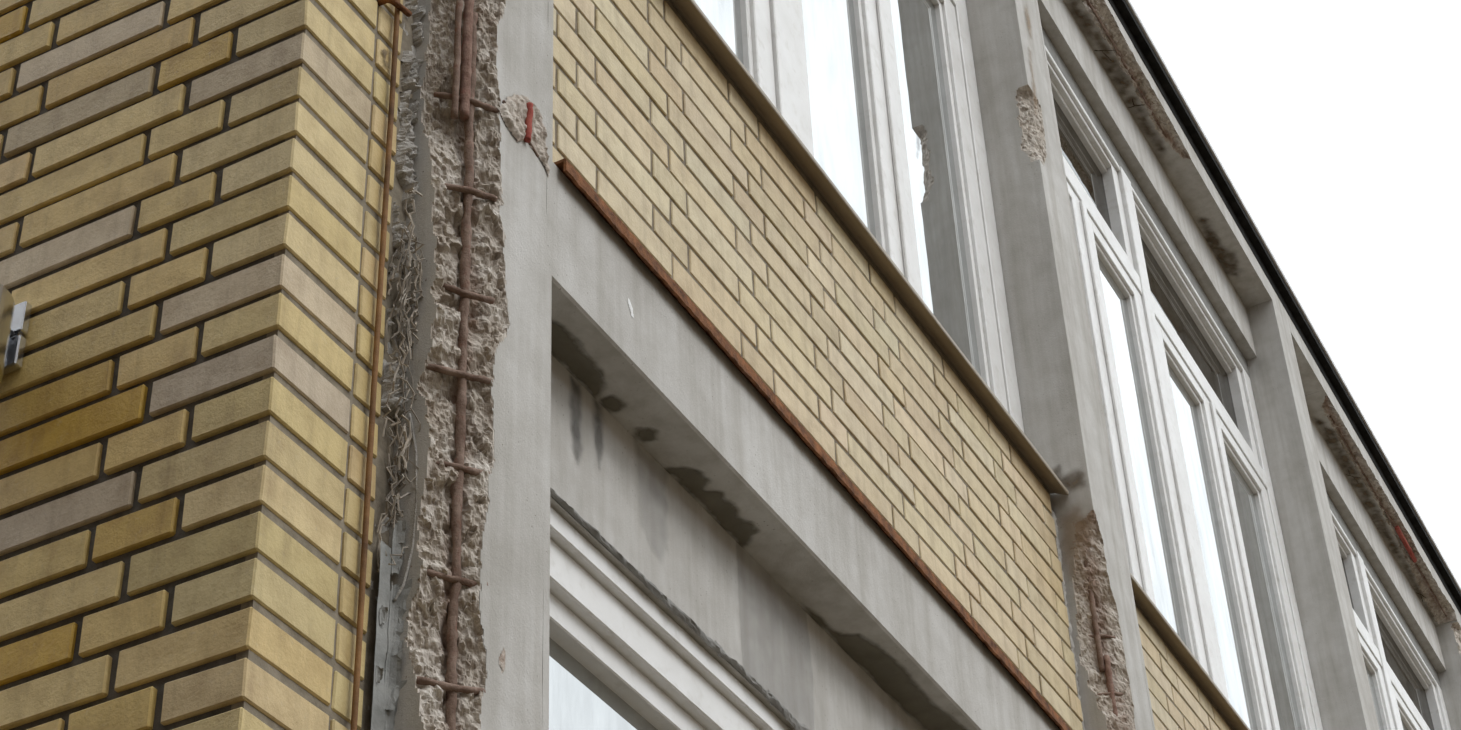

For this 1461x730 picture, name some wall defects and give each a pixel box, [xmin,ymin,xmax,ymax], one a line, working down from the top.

spalling [1015,84,1047,165]
spalling [371,0,550,730]
water stain [551,322,624,457]
water stain [637,429,656,441]
water stain [666,468,758,547]
spalling [1321,395,1461,654]
spalling [1072,510,1136,730]